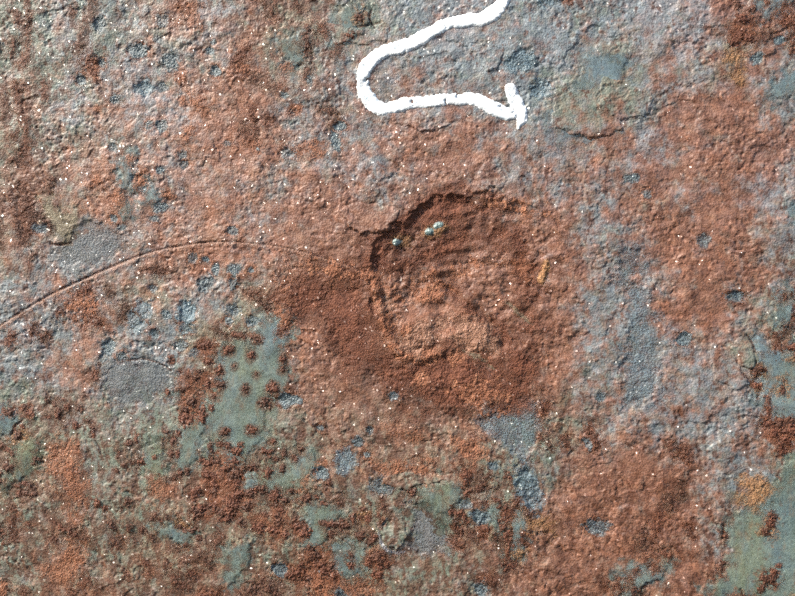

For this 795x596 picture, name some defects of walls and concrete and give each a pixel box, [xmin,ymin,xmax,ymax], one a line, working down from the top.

rust [9,186,56,246]
rust [394,321,441,388]
rust [448,314,501,367]
rust [0,404,35,483]
rust [45,396,96,438]
rust [162,327,263,458]
rust [445,373,512,418]
rust [752,363,795,455]
rust [31,425,390,596]
rust [448,497,553,572]
rust [758,510,778,537]
rust [755,563,782,594]